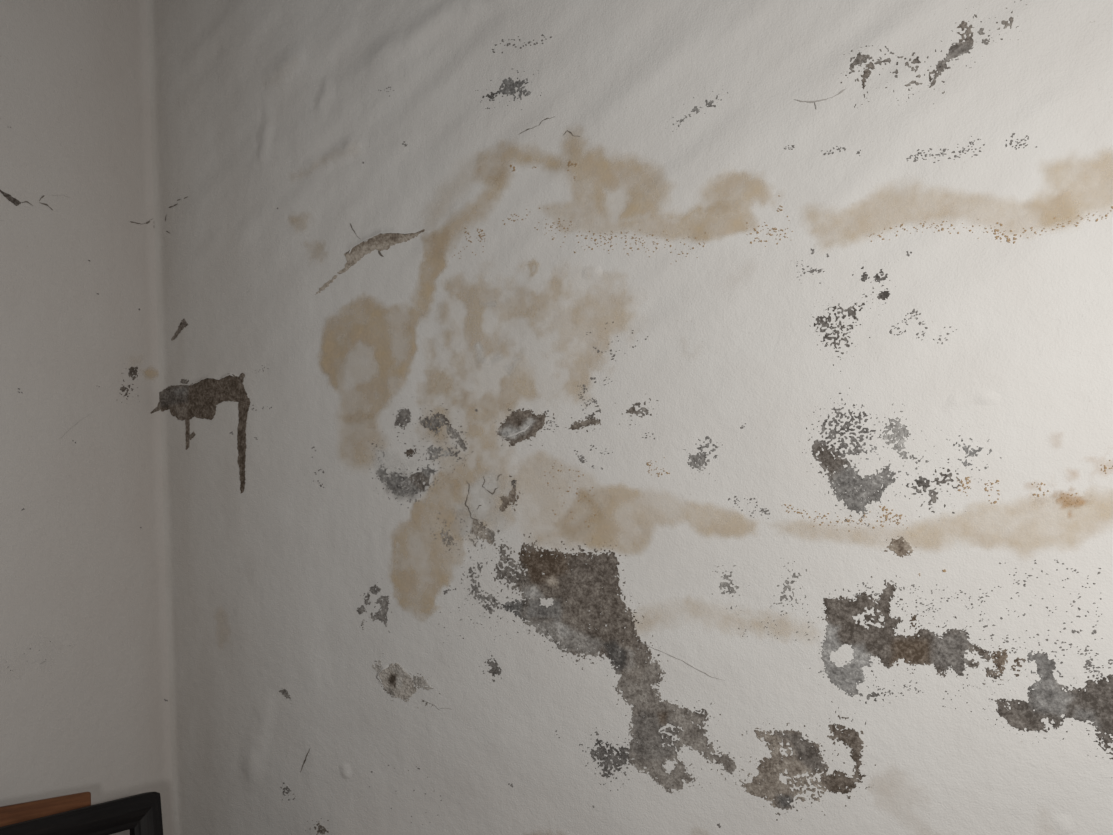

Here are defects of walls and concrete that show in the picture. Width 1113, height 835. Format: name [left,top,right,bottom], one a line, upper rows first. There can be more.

flaking render [475,67,541,110]
flaking render [841,0,1027,106]
damp [907,136,985,163]
damp [321,217,467,411]
flaking render [150,365,272,493]
flaking render [371,402,473,508]
flaking render [496,408,554,446]
flaking render [799,389,1002,527]
damp [371,431,503,625]
spalling [372,653,440,708]
flaking render [437,475,1113,821]
damp [896,560,1113,679]